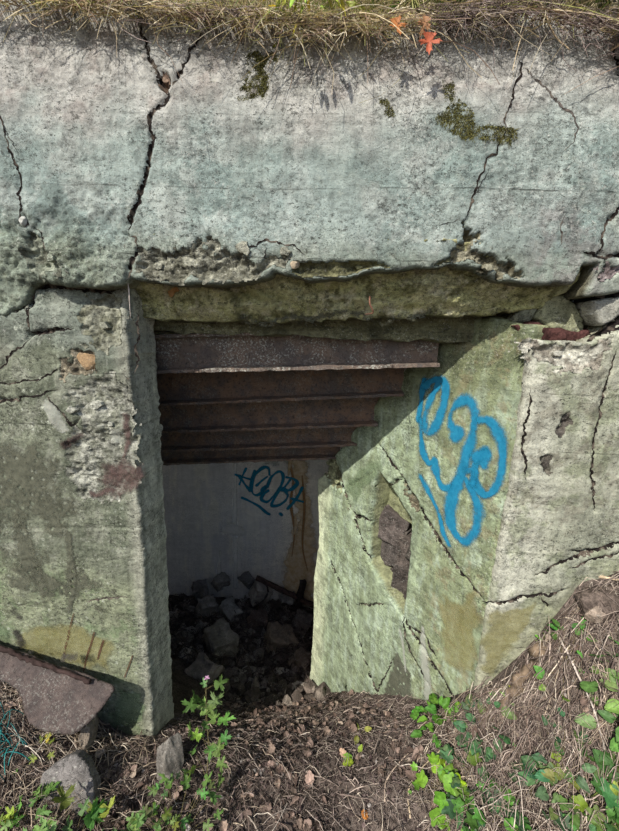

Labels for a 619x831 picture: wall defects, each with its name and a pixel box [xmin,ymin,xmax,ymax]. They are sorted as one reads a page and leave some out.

crack [441,33,579,225]
crack [0,18,204,427]
spalling [135,236,390,286]
spalling [437,221,523,280]
crack [582,207,619,260]
spalling [593,259,619,282]
crack [521,388,533,474]
crack [587,318,619,511]
water stain [283,460,316,604]
crack [380,445,619,607]
corrosion [83,632,104,672]
crack [330,561,453,695]